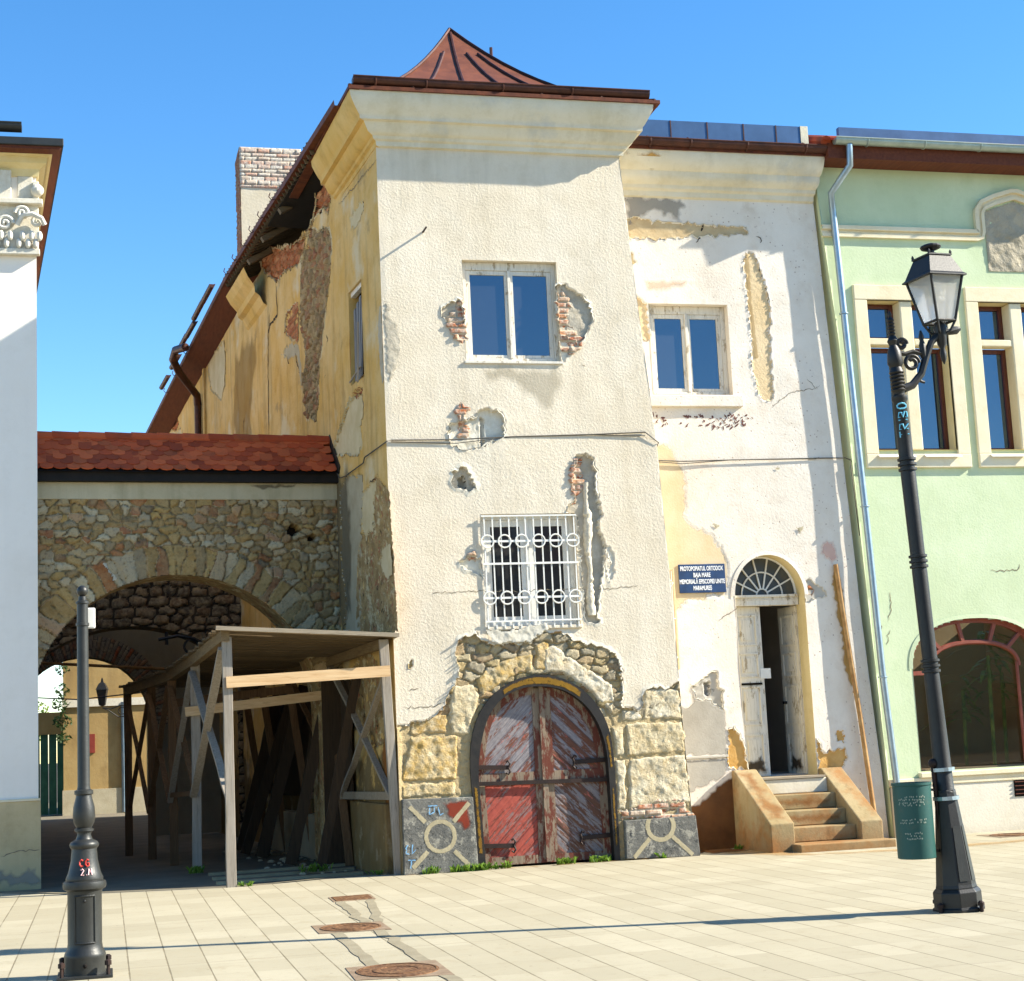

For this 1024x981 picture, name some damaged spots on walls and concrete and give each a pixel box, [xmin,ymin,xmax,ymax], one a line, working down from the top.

spalling [259,184,331,283]
peeling [627,216,748,241]
flaking render [440,296,469,343]
flaking render [554,282,594,363]
peeling [743,252,774,401]
flaking render [448,402,506,497]
flaking render [568,458,587,505]
peeling [356,475,398,633]
peeling [605,546,615,582]
flaking render [350,623,724,875]
peeling [727,727,766,772]
peeling [816,730,848,768]